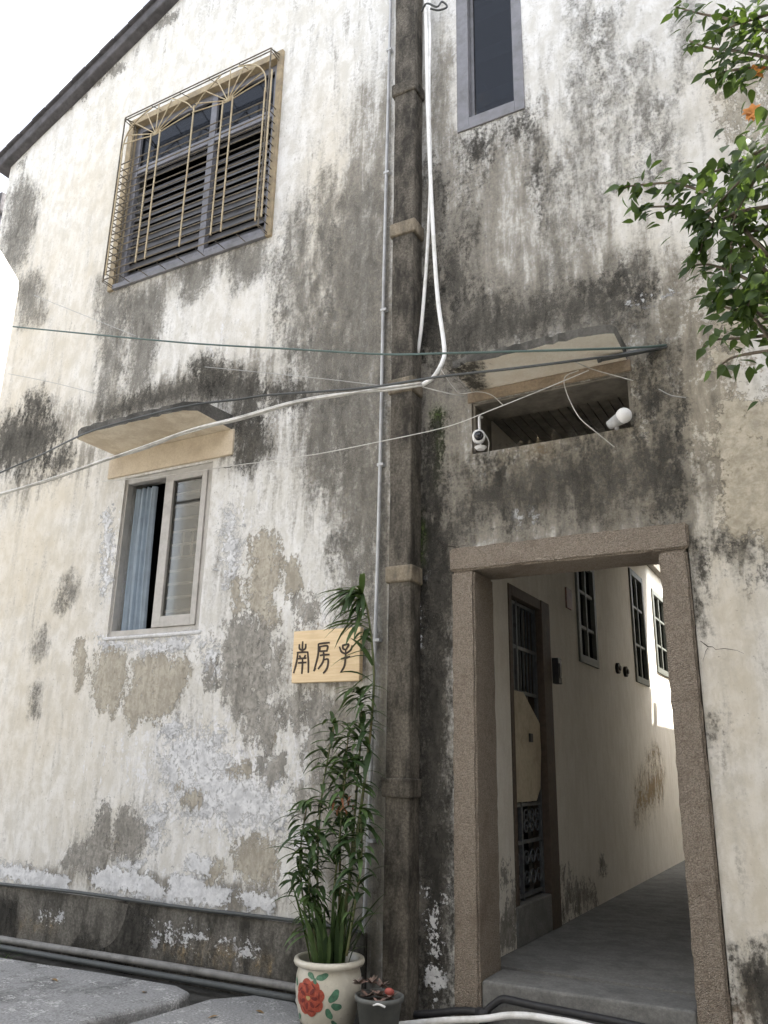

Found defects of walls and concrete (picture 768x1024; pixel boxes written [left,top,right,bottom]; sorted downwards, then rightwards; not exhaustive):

damp [568,0,679,236]
damp [1,177,48,325]
damp [421,111,660,391]
damp [0,391,77,483]
damp [95,172,392,647]
peeling [0,503,352,966]
damp [418,341,696,1017]
peeling [419,886,453,1008]
damp [728,940,768,1024]